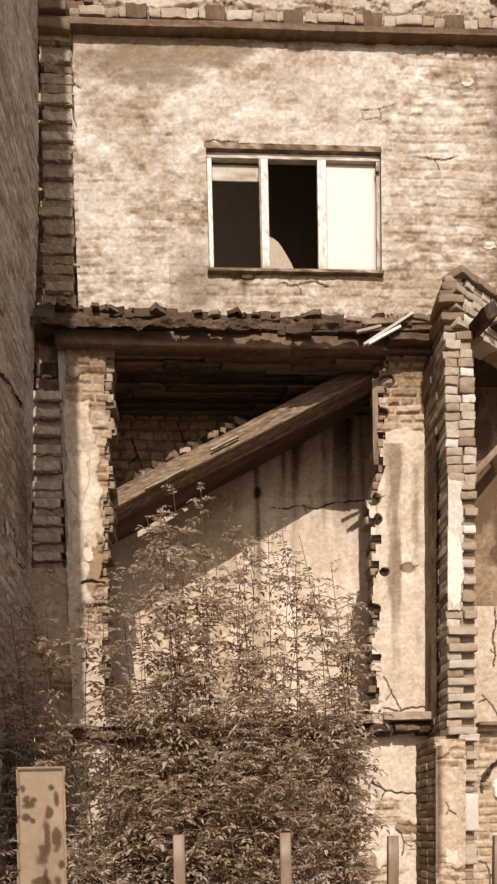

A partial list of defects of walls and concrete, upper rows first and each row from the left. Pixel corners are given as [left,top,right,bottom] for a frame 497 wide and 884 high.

crack [0,373,23,409]
leakage [427,434,436,512]
crack [272,499,368,514]
spalling [369,490,385,525]
leakage [389,446,401,596]
crack [489,608,497,667]
crack [384,678,424,712]
crack [373,783,417,800]